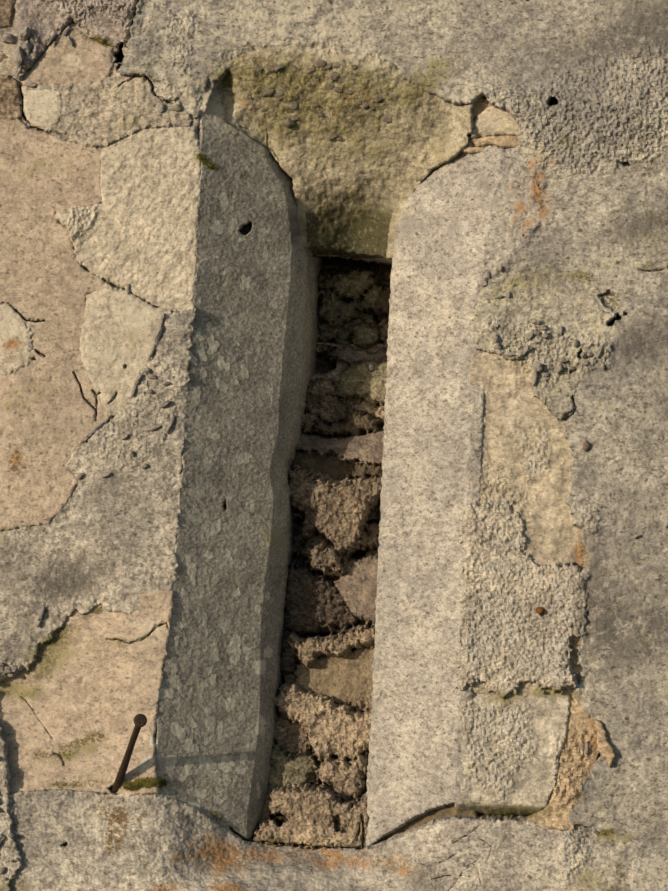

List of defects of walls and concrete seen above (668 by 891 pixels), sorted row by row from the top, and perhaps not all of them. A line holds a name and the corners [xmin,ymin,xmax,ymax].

flaking render [0,0,139,88]
damp [248,59,392,122]
flaking render [479,266,503,287]
flaking render [131,313,170,397]
flaking render [82,422,104,441]
flaking render [454,319,617,832]